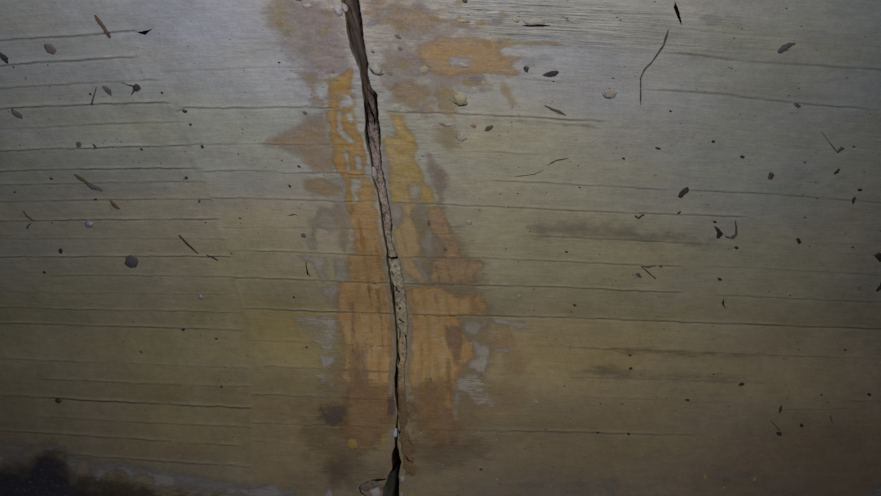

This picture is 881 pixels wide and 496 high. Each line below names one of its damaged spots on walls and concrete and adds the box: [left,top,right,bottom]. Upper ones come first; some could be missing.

corrosion [268,68,393,449]
crack [344,0,408,406]
corrosion [382,115,487,446]
corrosion [366,1,536,114]
damp [0,442,296,496]
crack [382,459,401,496]